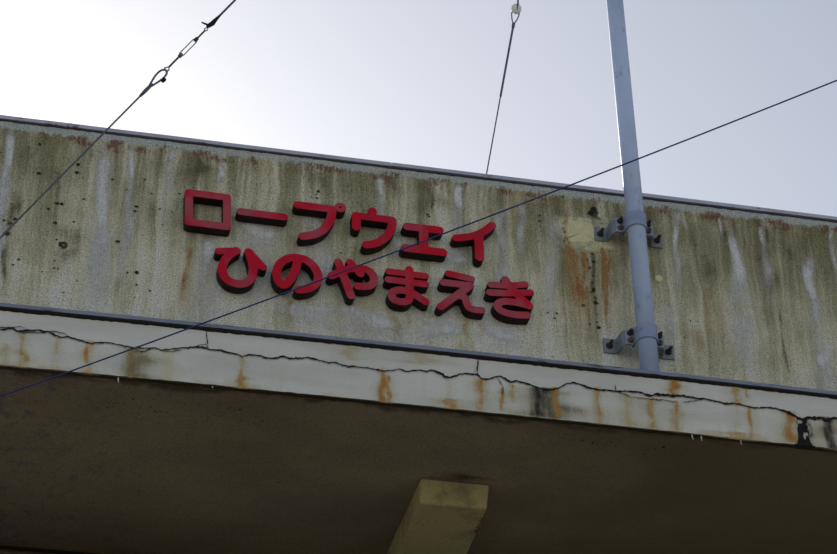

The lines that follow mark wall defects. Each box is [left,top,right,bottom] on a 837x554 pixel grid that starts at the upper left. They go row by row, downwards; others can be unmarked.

damp [0,135,21,277]
damp [91,156,139,280]
damp [242,223,278,246]
damp [581,252,601,329]
damp [588,206,604,224]
rust [601,248,611,313]
damp [718,218,746,299]
damp [803,261,819,323]
rust [379,369,392,402]
crack [0,326,837,422]
damp [530,387,582,429]
damp [823,417,836,449]